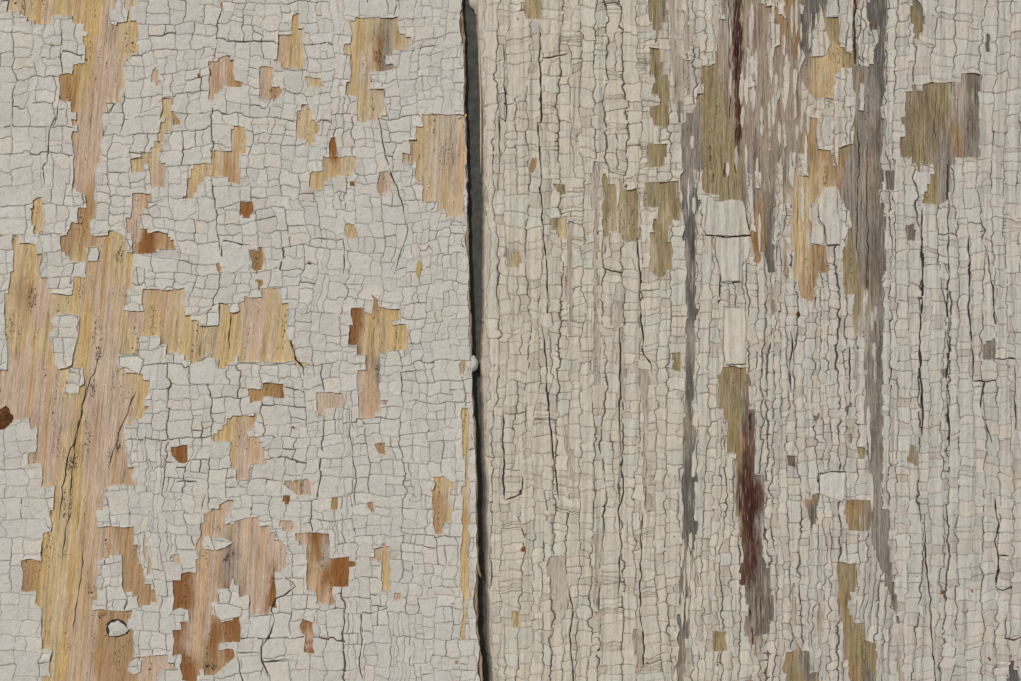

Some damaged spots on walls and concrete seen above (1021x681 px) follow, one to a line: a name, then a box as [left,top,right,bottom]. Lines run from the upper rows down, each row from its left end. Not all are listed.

crack [59,351,100,628]
peeling [0,0,357,681]
peeling [316,295,410,420]
peeling [343,17,413,123]
peeling [402,114,467,218]
crack [502,413,523,500]
crack [537,25,566,499]
crack [618,238,652,665]
peeling [588,0,899,681]
peeling [900,73,982,205]
crack [918,164,1017,457]
crack [237,577,296,681]